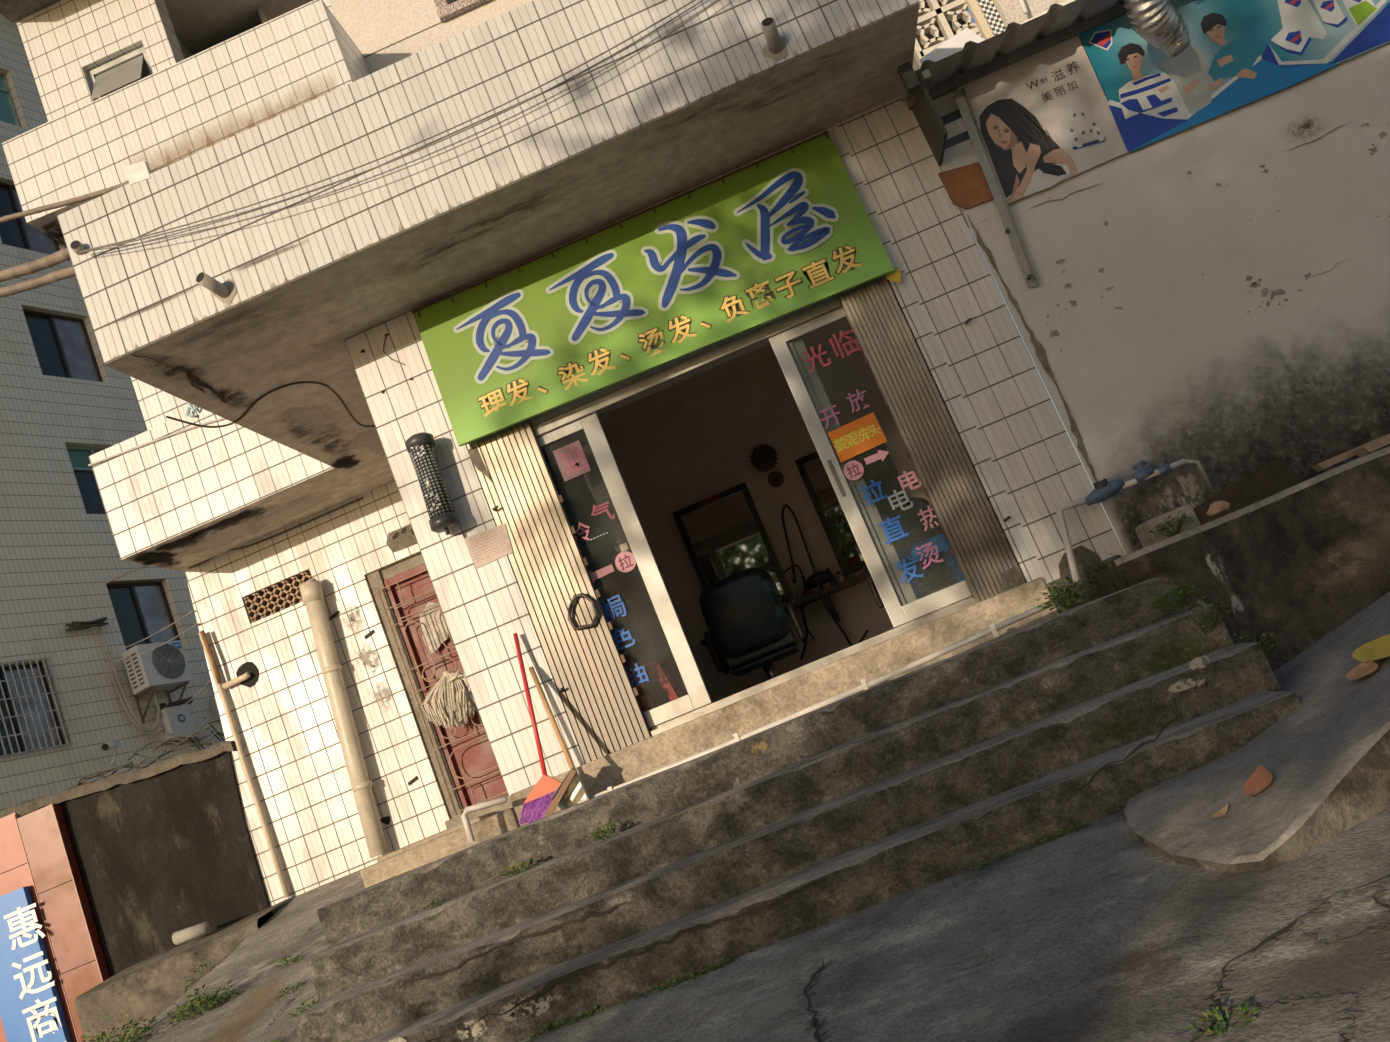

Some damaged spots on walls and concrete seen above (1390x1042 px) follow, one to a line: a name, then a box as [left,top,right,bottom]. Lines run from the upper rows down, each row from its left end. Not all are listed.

peeling [1239,272,1311,313]
leakage [293,425,360,469]
leakage [1115,354,1390,550]
crack [1078,716,1182,790]
crack [953,875,1390,1042]
spalling [457,995,562,1040]